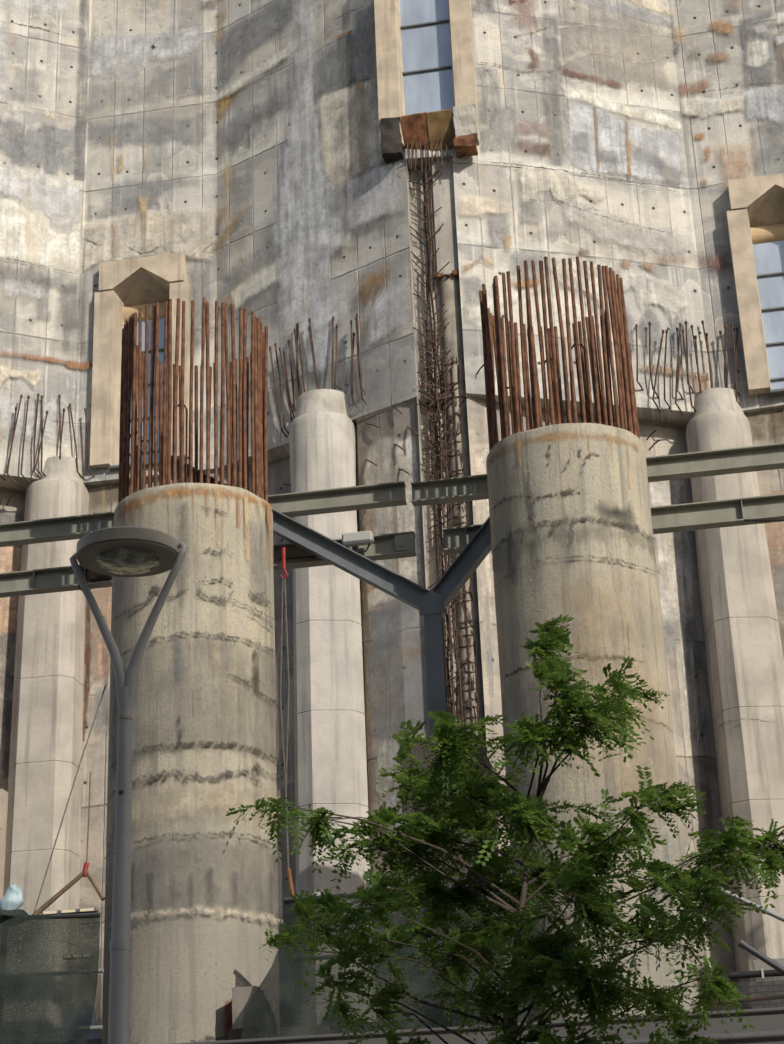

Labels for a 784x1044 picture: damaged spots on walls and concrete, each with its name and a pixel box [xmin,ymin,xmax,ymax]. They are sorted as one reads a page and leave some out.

rust [563,68,621,87]
rust [1,352,90,369]
rust [121,489,272,559]
crack [490,445,661,586]
crack [110,547,279,707]
crack [506,654,644,677]
crack [109,715,280,799]